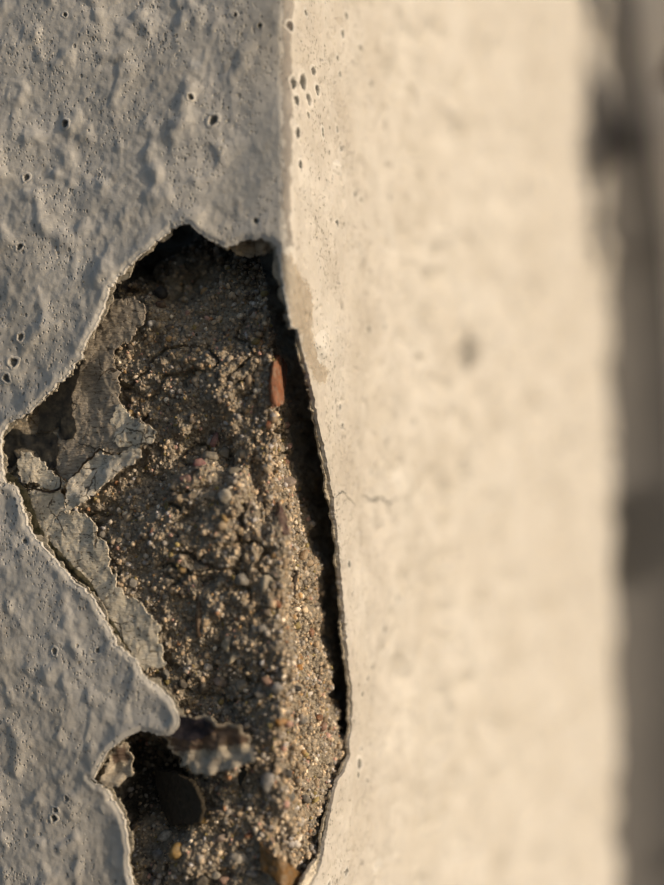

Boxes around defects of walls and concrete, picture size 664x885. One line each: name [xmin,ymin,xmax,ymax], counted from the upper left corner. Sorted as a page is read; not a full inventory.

spalling [0,355,21,385]
crack [27,448,122,494]
spalling [6,225,369,885]